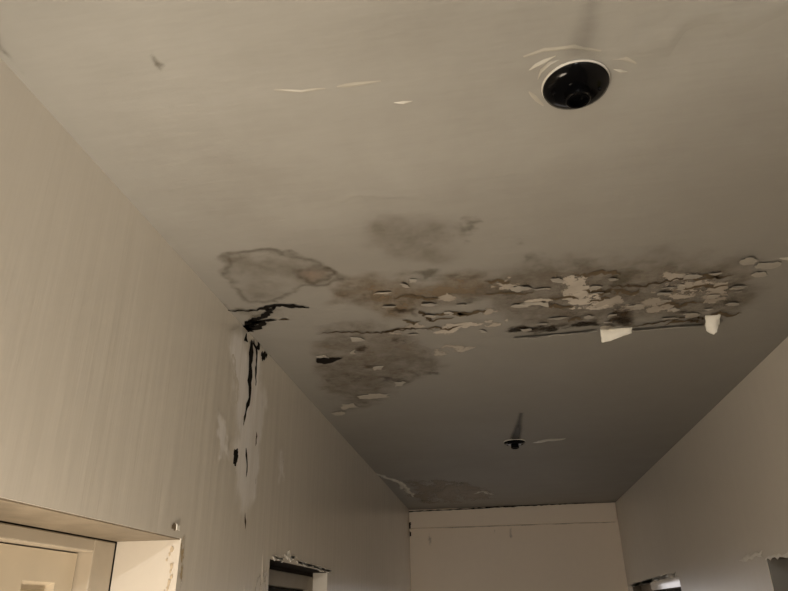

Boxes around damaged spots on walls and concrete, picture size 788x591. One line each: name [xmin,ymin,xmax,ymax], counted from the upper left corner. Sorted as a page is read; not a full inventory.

crack [228,304,309,476]
water stain [339,279,500,322]
peeling [316,266,748,416]